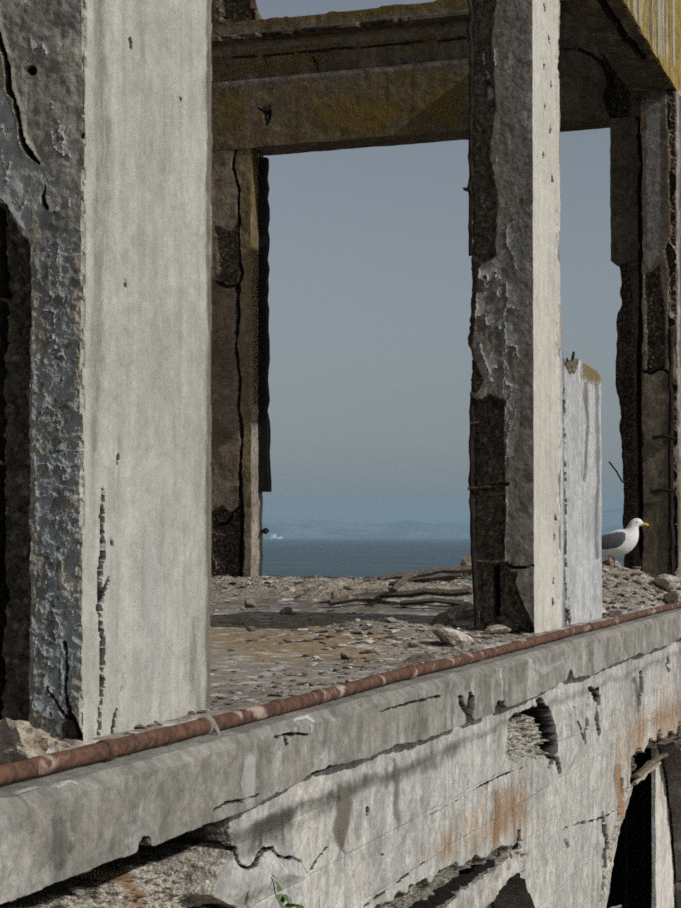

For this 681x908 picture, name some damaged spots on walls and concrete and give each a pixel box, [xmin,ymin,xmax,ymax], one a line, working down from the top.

peeling [30,35,51,59]
crack [597,0,648,60]
crack [0,32,49,210]
spalling [463,0,535,634]
crack [215,150,244,577]
spalling [0,89,84,740]
crack [46,488,118,739]
spalling [495,699,550,764]
crack [213,793,259,812]
spalling [0,816,237,908]
crack [163,835,328,871]
spalling [374,842,528,908]